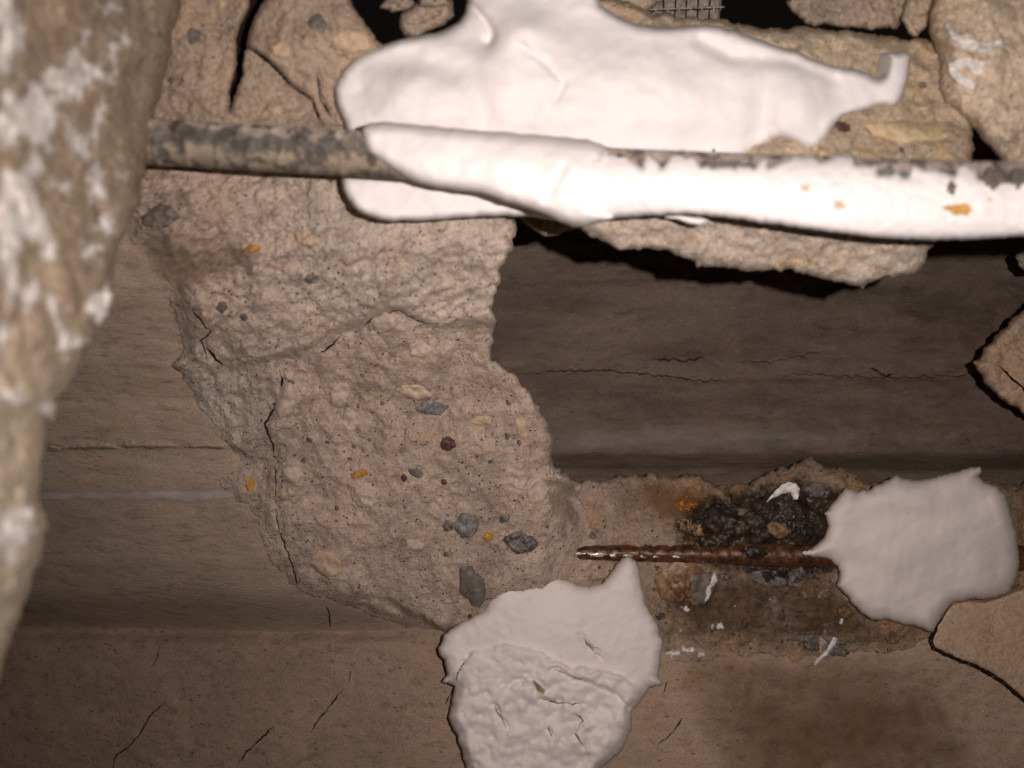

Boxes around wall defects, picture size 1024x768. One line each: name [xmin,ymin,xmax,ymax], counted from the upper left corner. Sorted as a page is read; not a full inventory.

crack [229,0,332,119]
spalling [599,0,974,160]
spalling [581,214,934,288]
spalling [0,0,877,674]
crack [524,351,1024,391]
spalling [973,309,1024,415]
crack [264,369,298,587]
corrosion [677,480,864,635]
spalling [637,562,934,666]
crack [931,605,1024,701]
spalling [952,571,1024,604]
spalling [985,479,1024,546]